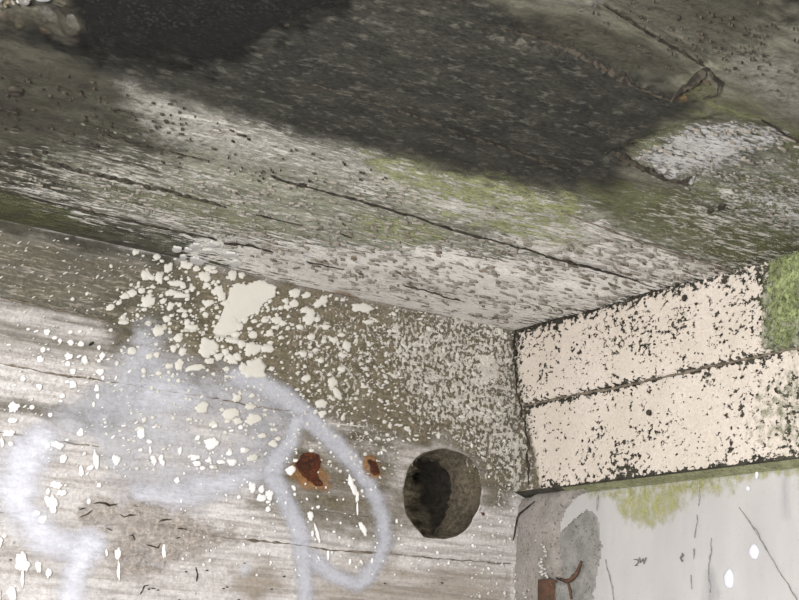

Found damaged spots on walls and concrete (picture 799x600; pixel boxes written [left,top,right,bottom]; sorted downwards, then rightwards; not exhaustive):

leakage [627,0,770,47]
spalling [658,10,779,103]
leakage [736,57,799,112]
leakage [0,0,732,506]
peeling [0,74,799,514]
corrosion [291,452,329,490]
leakage [281,432,380,541]
corrosion [363,455,380,477]
leakage [354,451,407,528]